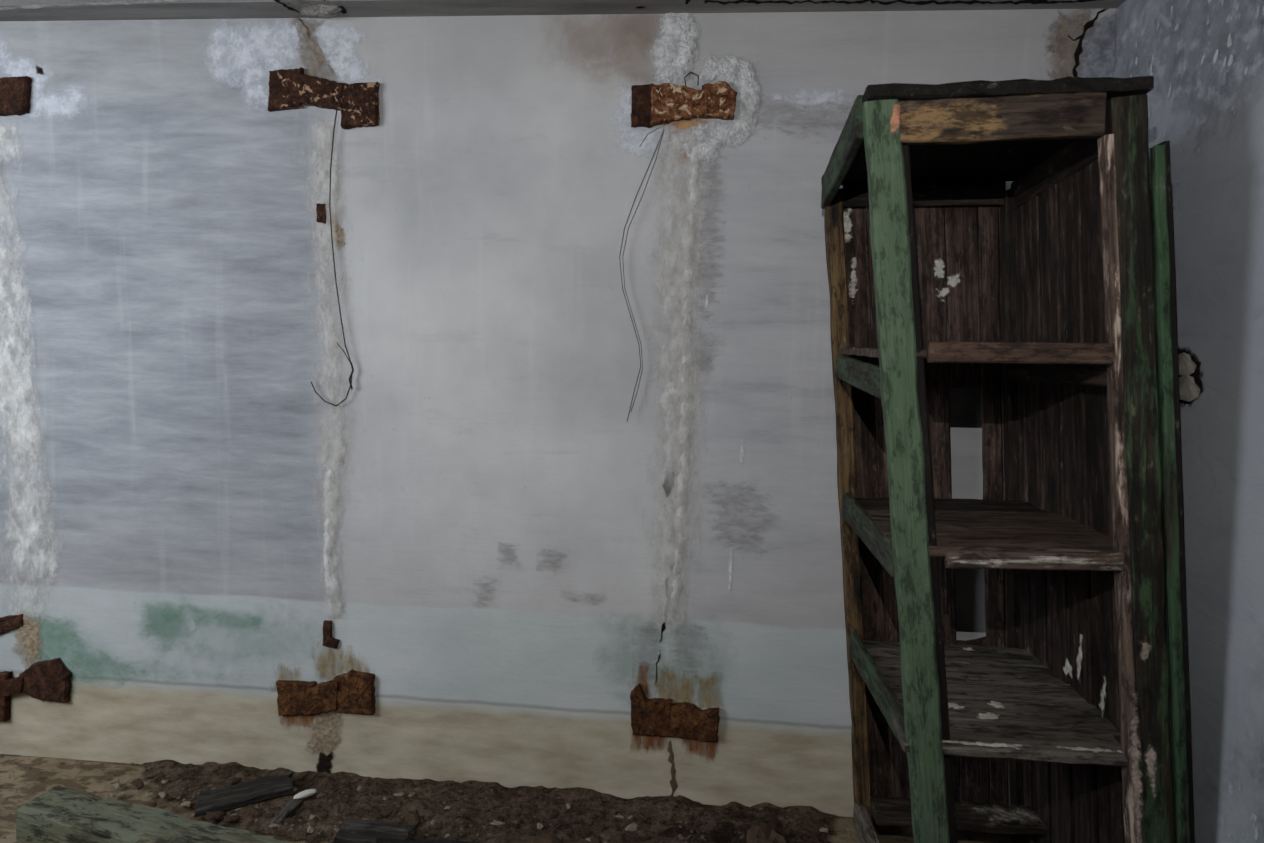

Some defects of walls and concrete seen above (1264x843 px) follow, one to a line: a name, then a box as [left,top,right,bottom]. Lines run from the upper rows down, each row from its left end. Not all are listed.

crack [274,0,347,36]
crack [685,0,1106,77]
corrosion [639,667,716,709]
corrosion [682,738,716,758]